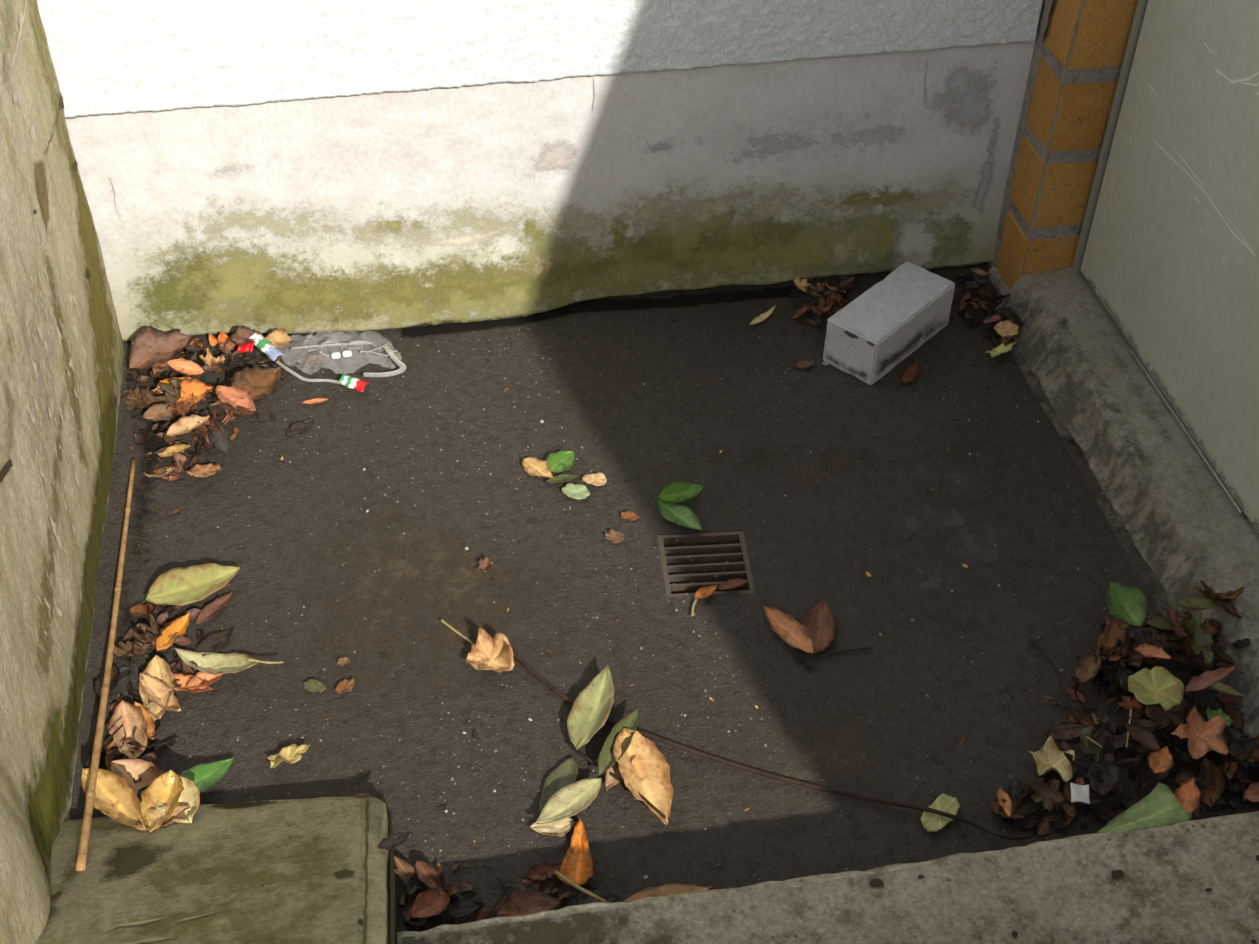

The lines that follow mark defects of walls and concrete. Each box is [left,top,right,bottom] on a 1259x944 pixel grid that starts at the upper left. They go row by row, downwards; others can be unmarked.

leakage [35,162,49,240]
leakage [5,288,54,477]